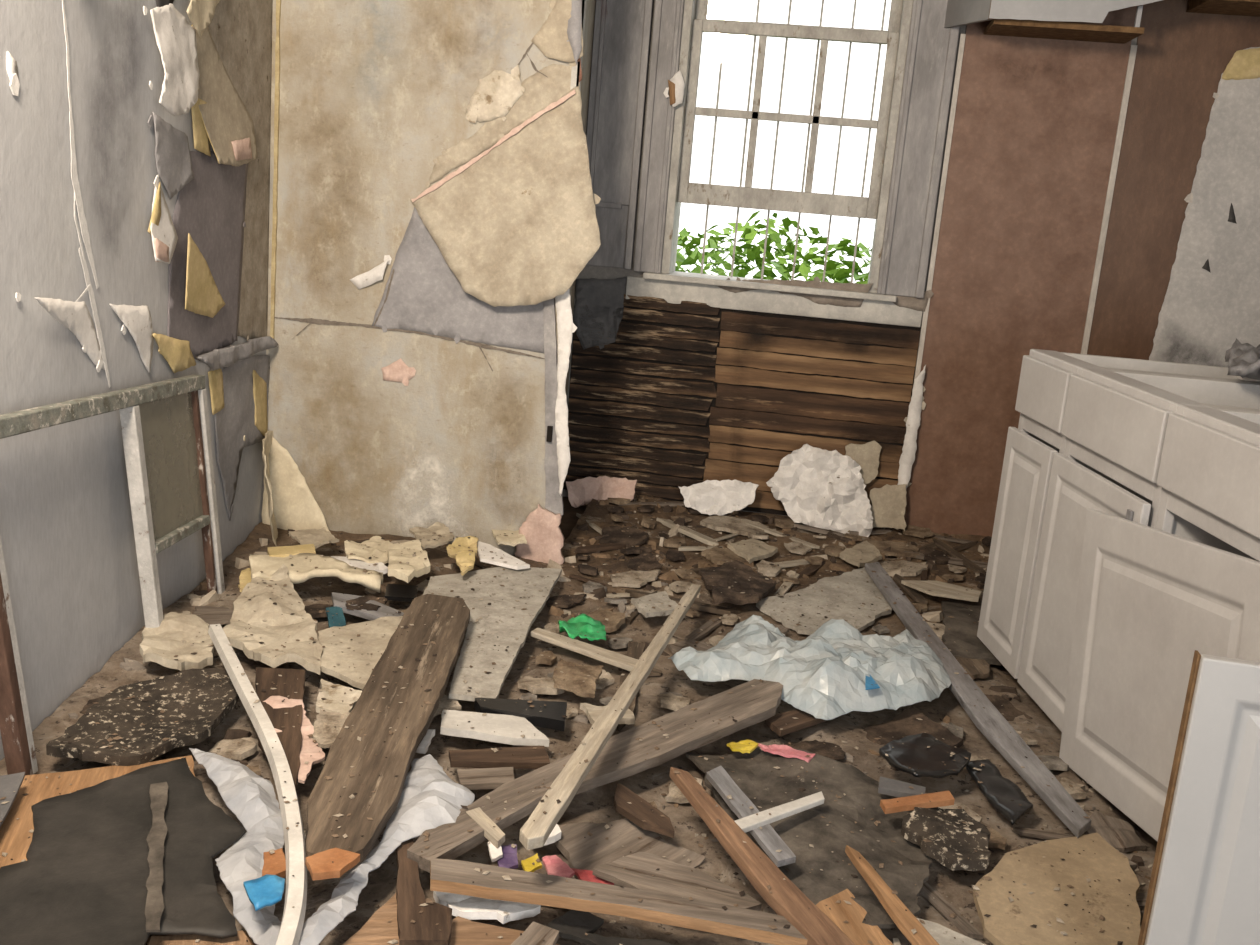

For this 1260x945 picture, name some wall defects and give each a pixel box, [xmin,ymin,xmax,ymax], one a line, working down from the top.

flaking render [152,0,273,359]
spalling [350,255,392,290]
flaking render [465,65,525,123]
peeling [1149,47,1260,367]